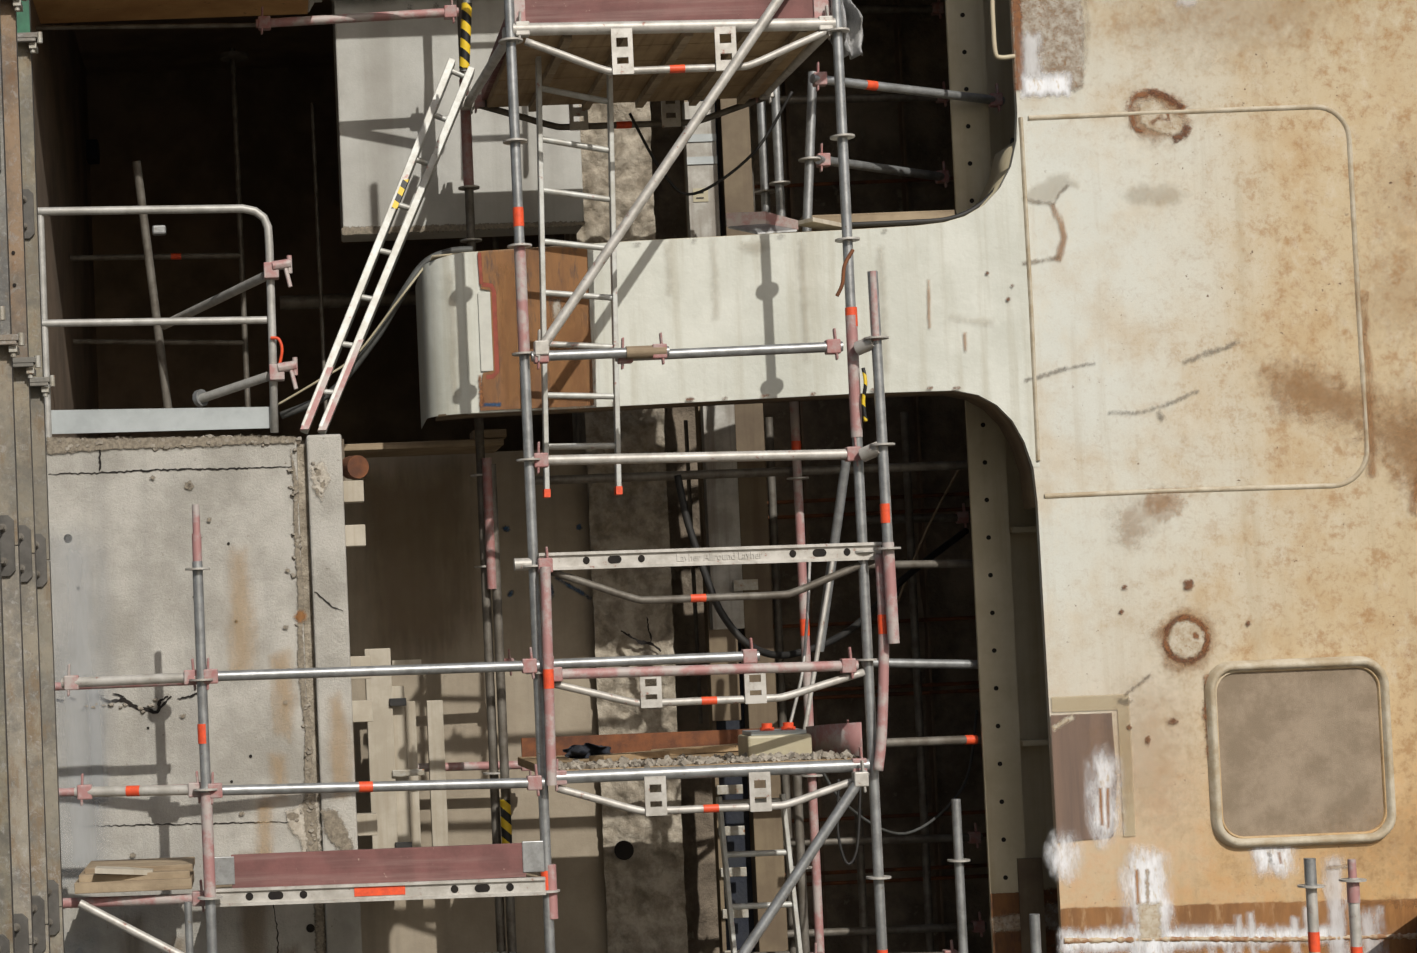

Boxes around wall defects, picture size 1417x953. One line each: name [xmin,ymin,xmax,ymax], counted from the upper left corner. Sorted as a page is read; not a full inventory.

rust [1012,0,1025,90]
rust [1127,88,1191,143]
rust [1163,615,1210,663]
crack [56,693,197,714]
damp [1099,788,1109,827]
damp [1135,870,1149,904]